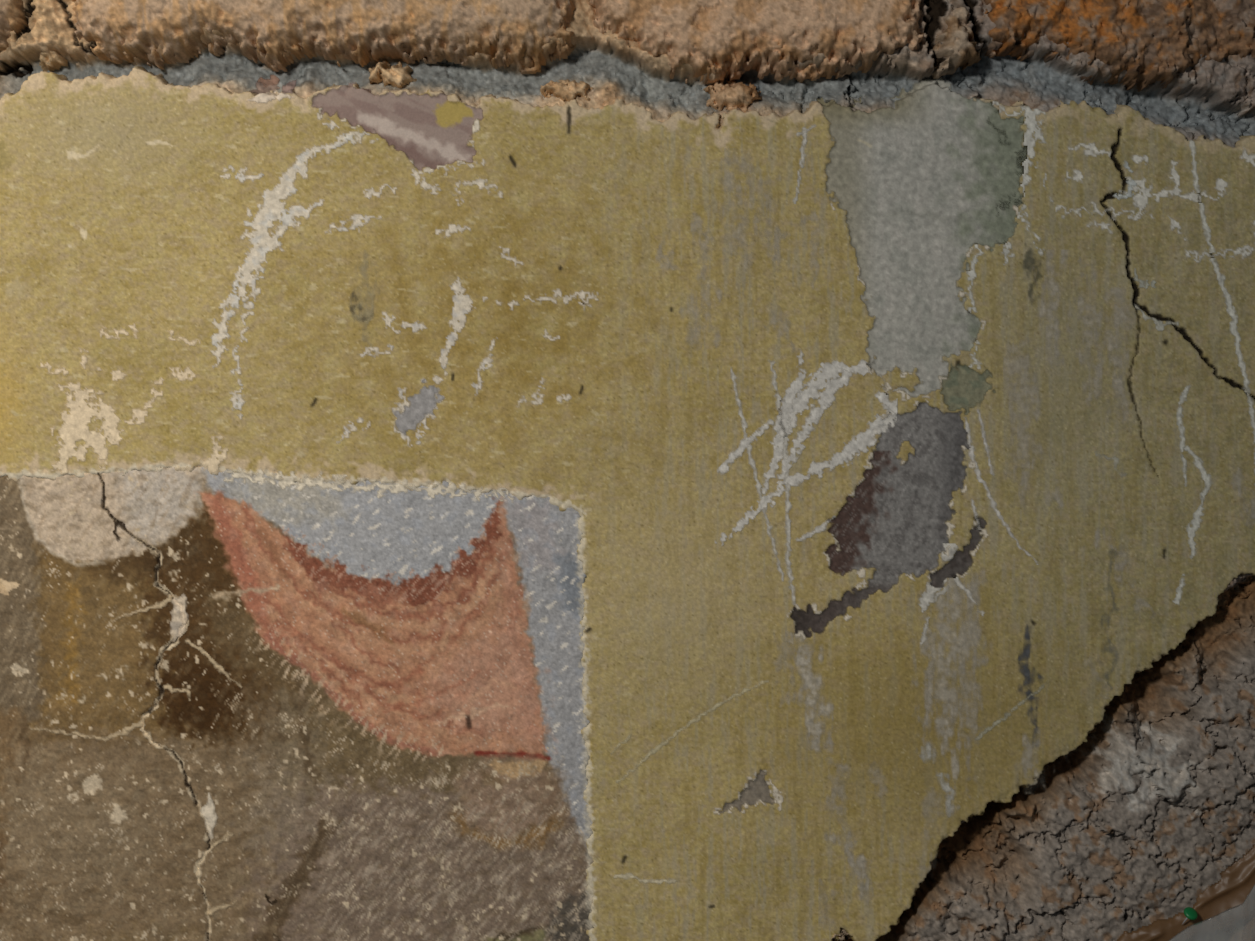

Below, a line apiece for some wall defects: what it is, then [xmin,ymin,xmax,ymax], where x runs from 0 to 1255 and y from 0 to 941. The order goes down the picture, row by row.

peeling [1240,150,1255,167]
peeling [80,349,126,381]
peeling [100,324,137,339]
peeling [41,362,196,475]
flaking render [169,83,503,419]
peeling [336,417,370,443]
peeling [392,277,598,447]
peeling [787,78,1227,639]
crack [1100,129,1255,476]
peeling [1169,217,1255,262]
crack [31,472,241,941]
flaking render [713,770,783,815]